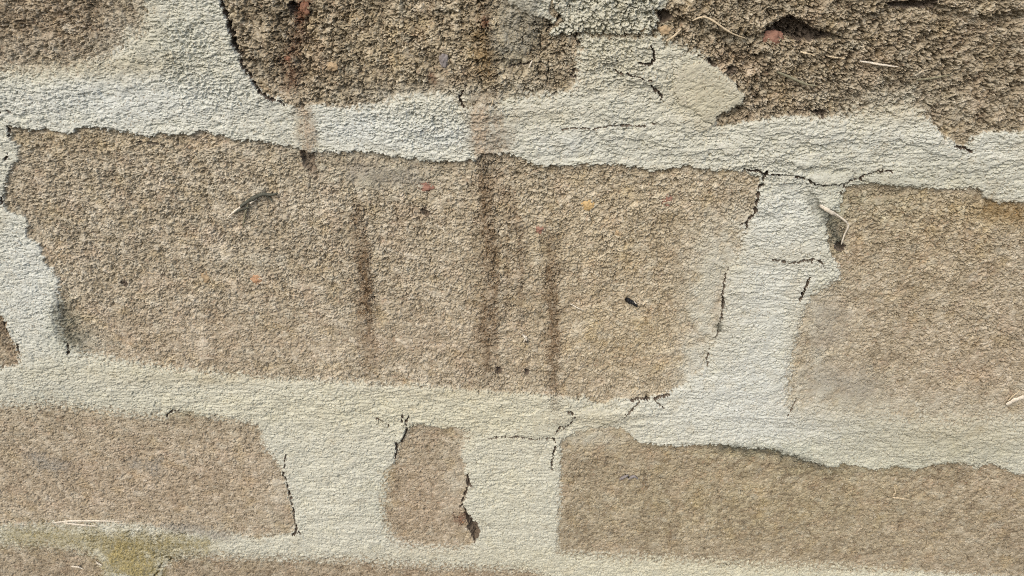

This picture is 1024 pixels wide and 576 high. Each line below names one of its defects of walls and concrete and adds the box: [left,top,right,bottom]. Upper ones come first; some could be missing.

hole [656,9,674,23]
hole [762,14,831,41]
hole [885,0,938,9]
peeling [672,58,745,133]
hole [299,149,317,173]
crack [740,168,893,229]
crack [772,258,826,302]
crack [616,393,670,423]
crack [375,414,409,460]
crack [488,411,581,471]
crack [282,454,301,536]
spalling [464,511,481,540]